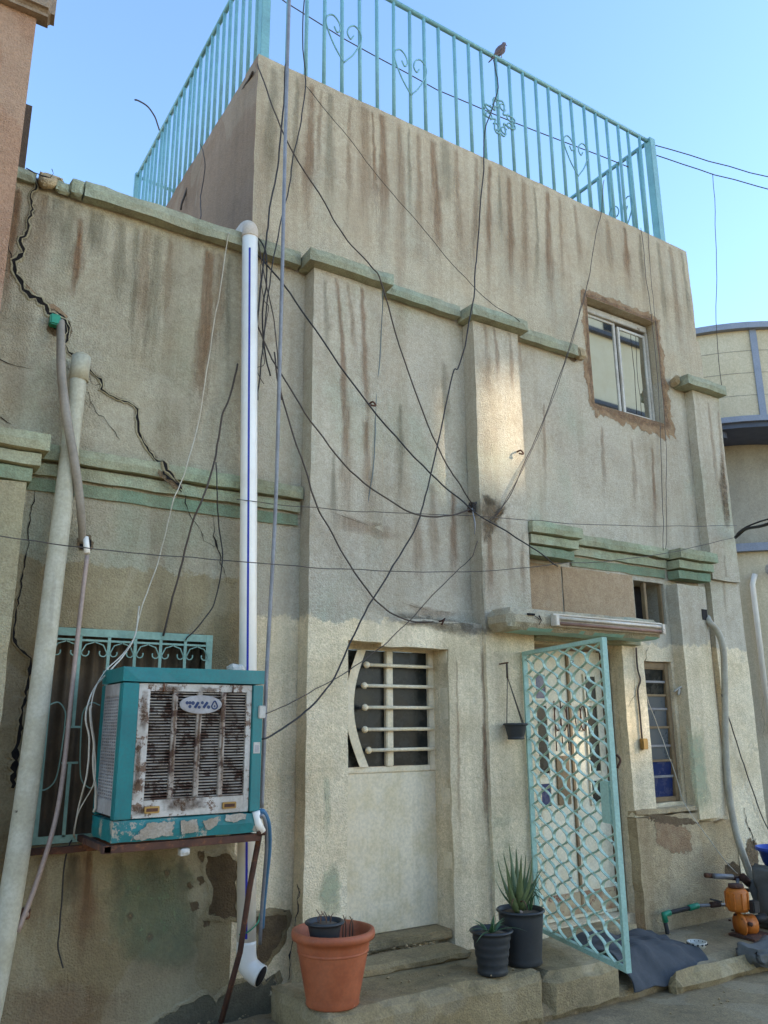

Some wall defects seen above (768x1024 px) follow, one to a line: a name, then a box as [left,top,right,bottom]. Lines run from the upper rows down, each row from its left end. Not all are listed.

crack [8,181,226,575]
peeling [568,289,680,441]
crack [6,491,35,789]
peeling [187,845,237,927]
spalling [644,814,699,854]